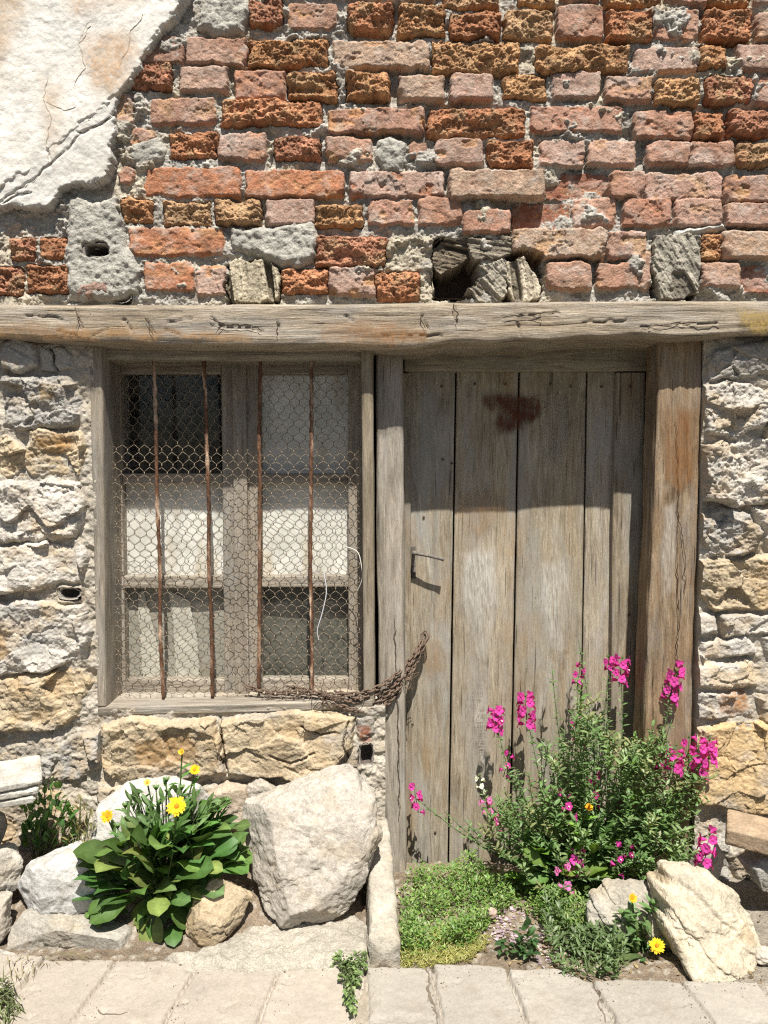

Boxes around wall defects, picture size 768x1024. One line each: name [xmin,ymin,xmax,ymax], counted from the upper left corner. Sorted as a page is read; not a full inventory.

crack [0,27,116,204]
flaking render [0,0,191,215]
rust [484,395,541,432]